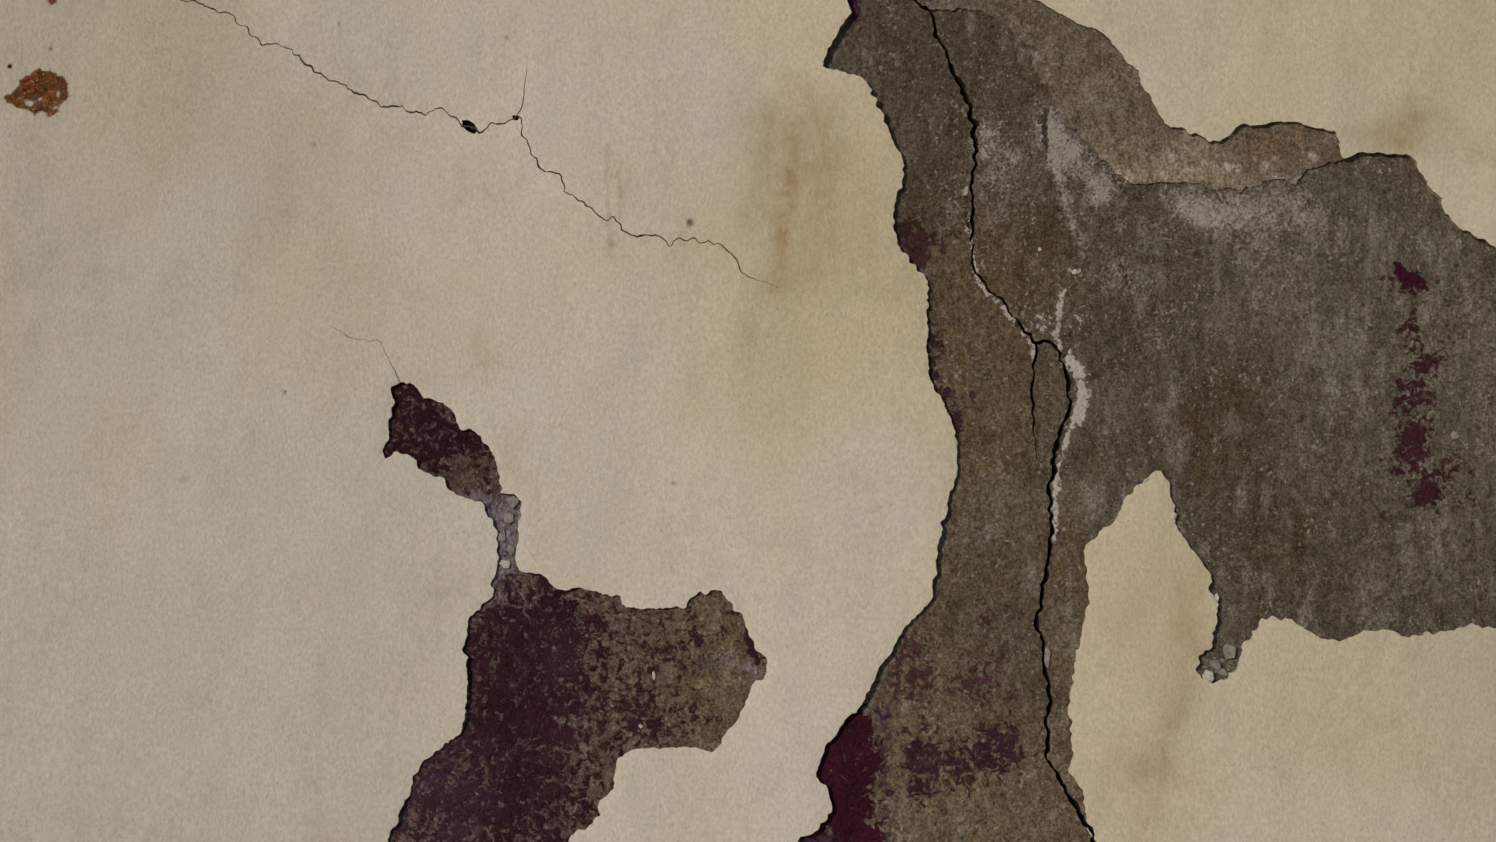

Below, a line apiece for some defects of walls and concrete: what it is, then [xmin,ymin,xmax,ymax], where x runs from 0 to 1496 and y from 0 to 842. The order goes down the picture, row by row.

rust [4,68,69,117]
crack [180,0,778,288]
peeling [383,384,767,842]
crack [913,0,1096,842]
peeling [817,0,1496,842]